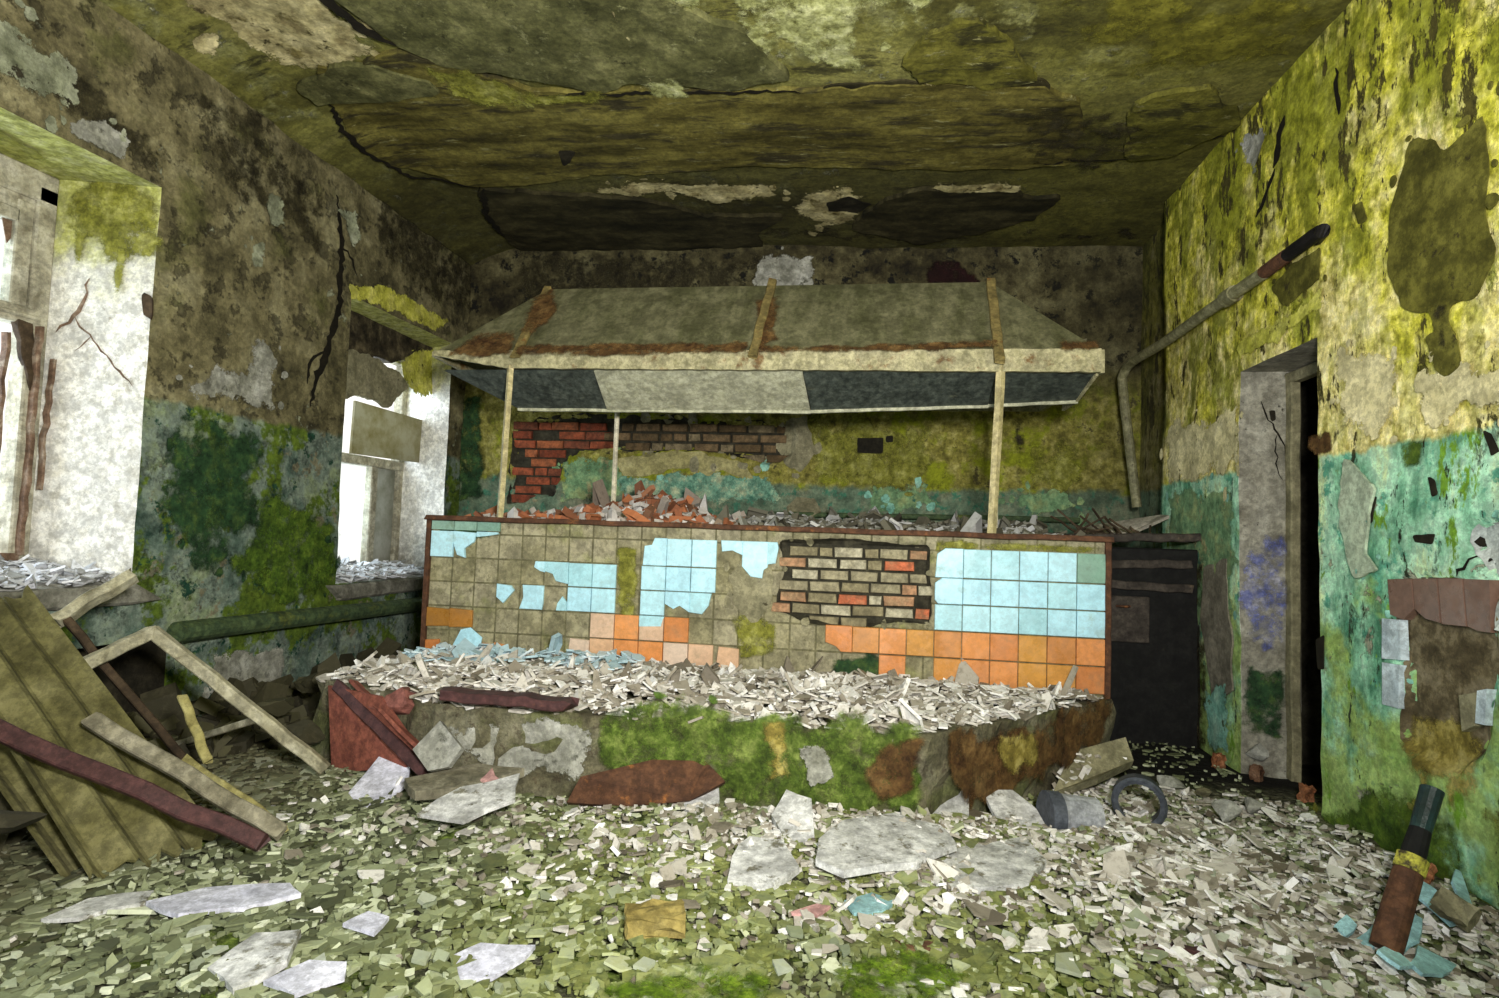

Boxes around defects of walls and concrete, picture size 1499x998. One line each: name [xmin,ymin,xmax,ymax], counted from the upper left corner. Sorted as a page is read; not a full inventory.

peeling [0,0,131,160]
crack [319,0,397,46]
peeling [185,0,1084,286]
crack [307,195,358,406]
peeling [1236,247,1327,359]
peeling [1330,115,1499,443]
spalling [724,535,933,630]
spalling [1308,432,1499,772]